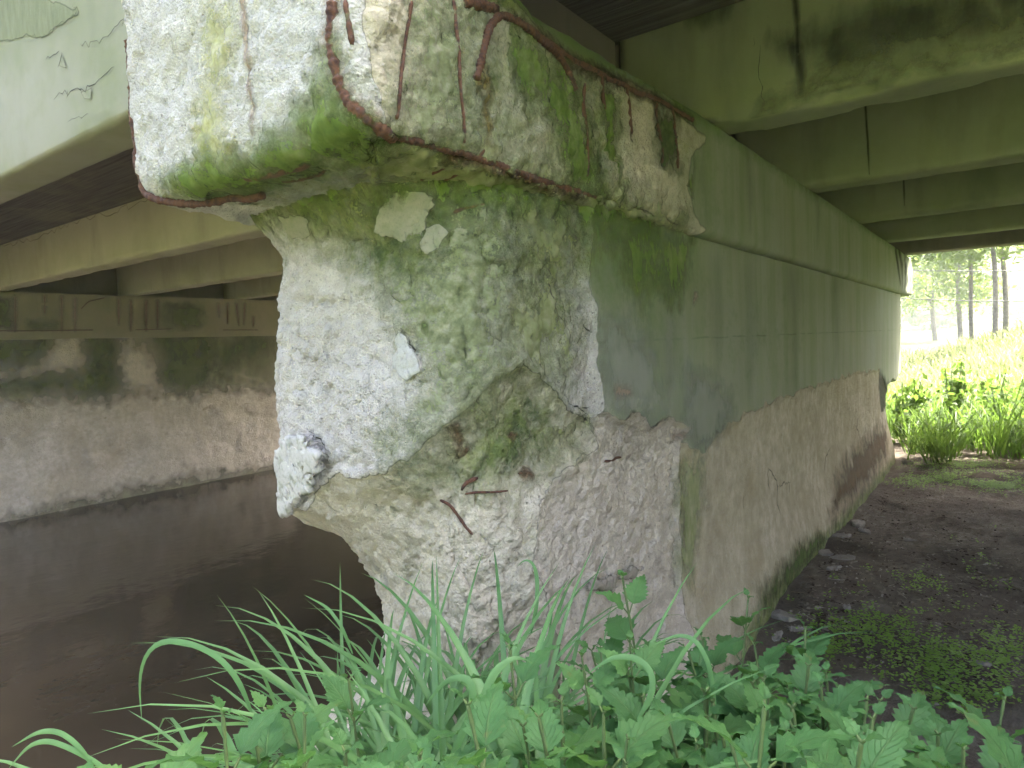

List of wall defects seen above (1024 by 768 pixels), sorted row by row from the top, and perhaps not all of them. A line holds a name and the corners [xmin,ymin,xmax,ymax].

crack [55,67,113,122]
corrosion [240,0,255,132]
corrosion [476,67,493,143]
spalling [332,0,706,236]
water stain [783,0,804,87]
spalling [0,0,604,523]
corrosion [451,423,469,458]
corrosion [518,466,534,478]
water stain [832,425,886,523]
spalling [291,364,895,706]
spalling [329,685,370,737]